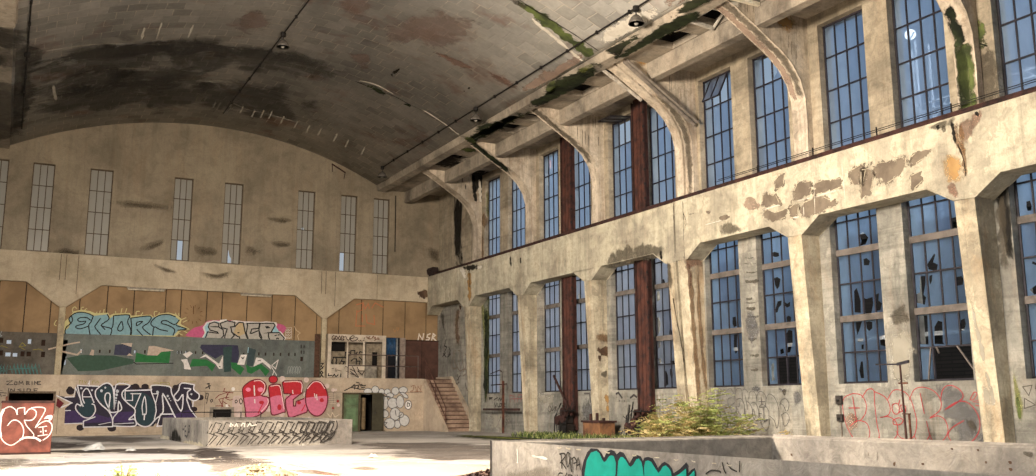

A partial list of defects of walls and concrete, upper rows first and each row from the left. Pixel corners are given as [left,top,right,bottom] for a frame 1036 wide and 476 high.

peeling [601,0,685,43]
damp [0,23,322,139]
spalling [744,148,932,222]